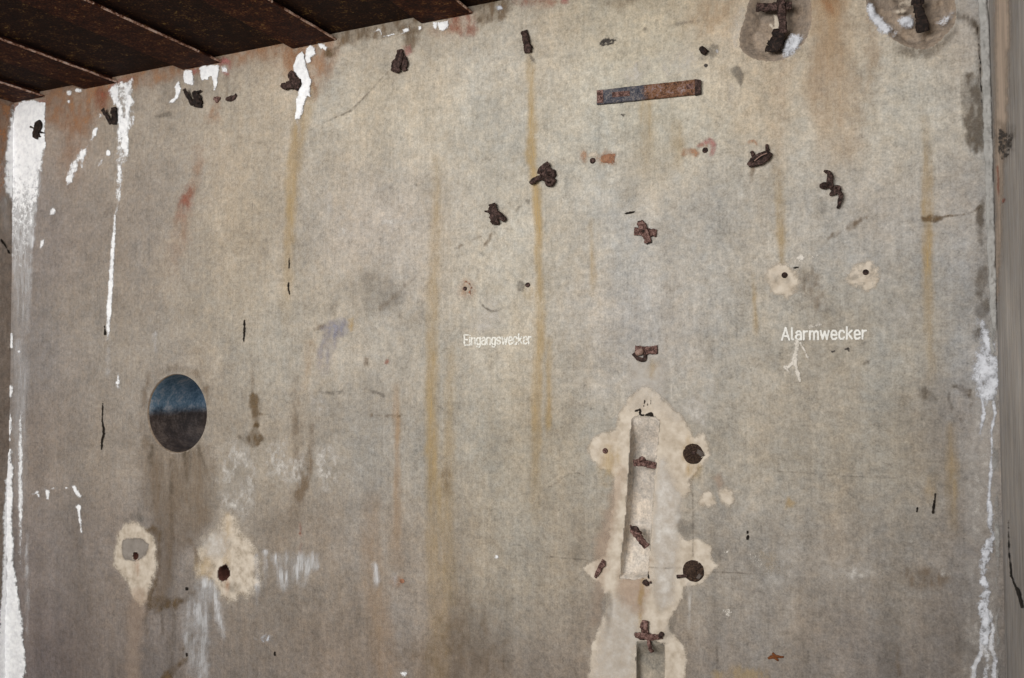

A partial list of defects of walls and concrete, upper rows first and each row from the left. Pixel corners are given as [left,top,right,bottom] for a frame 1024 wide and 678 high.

water stain [4,100,46,273]
water stain [66,114,101,185]
water stain [0,415,82,678]
spalling [218,564,230,581]
water stain [968,320,999,678]